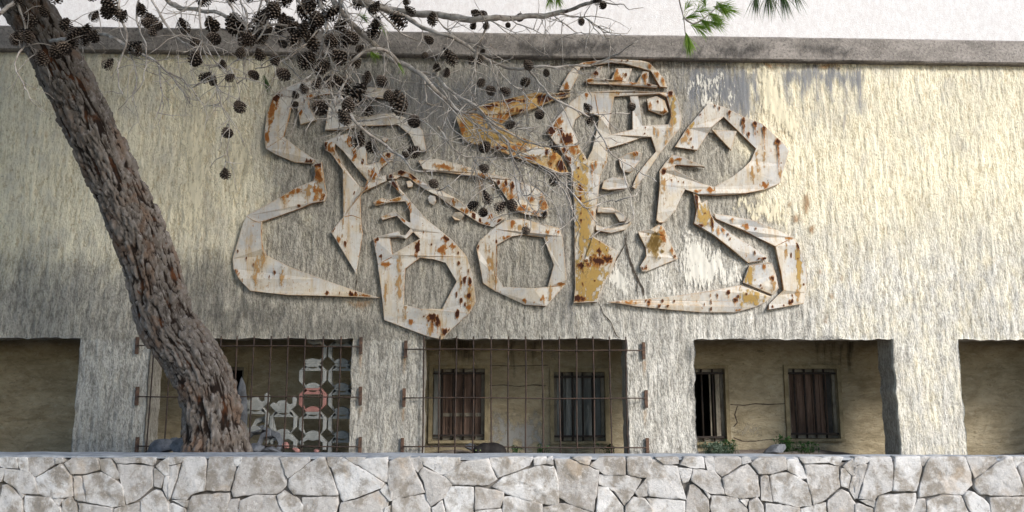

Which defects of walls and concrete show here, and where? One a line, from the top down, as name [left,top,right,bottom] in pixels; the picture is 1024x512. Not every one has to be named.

damp [655,45,758,119]
damp [784,46,862,107]
corrosion [459,82,613,302]
corrosion [641,226,676,271]
crack [730,403,785,442]